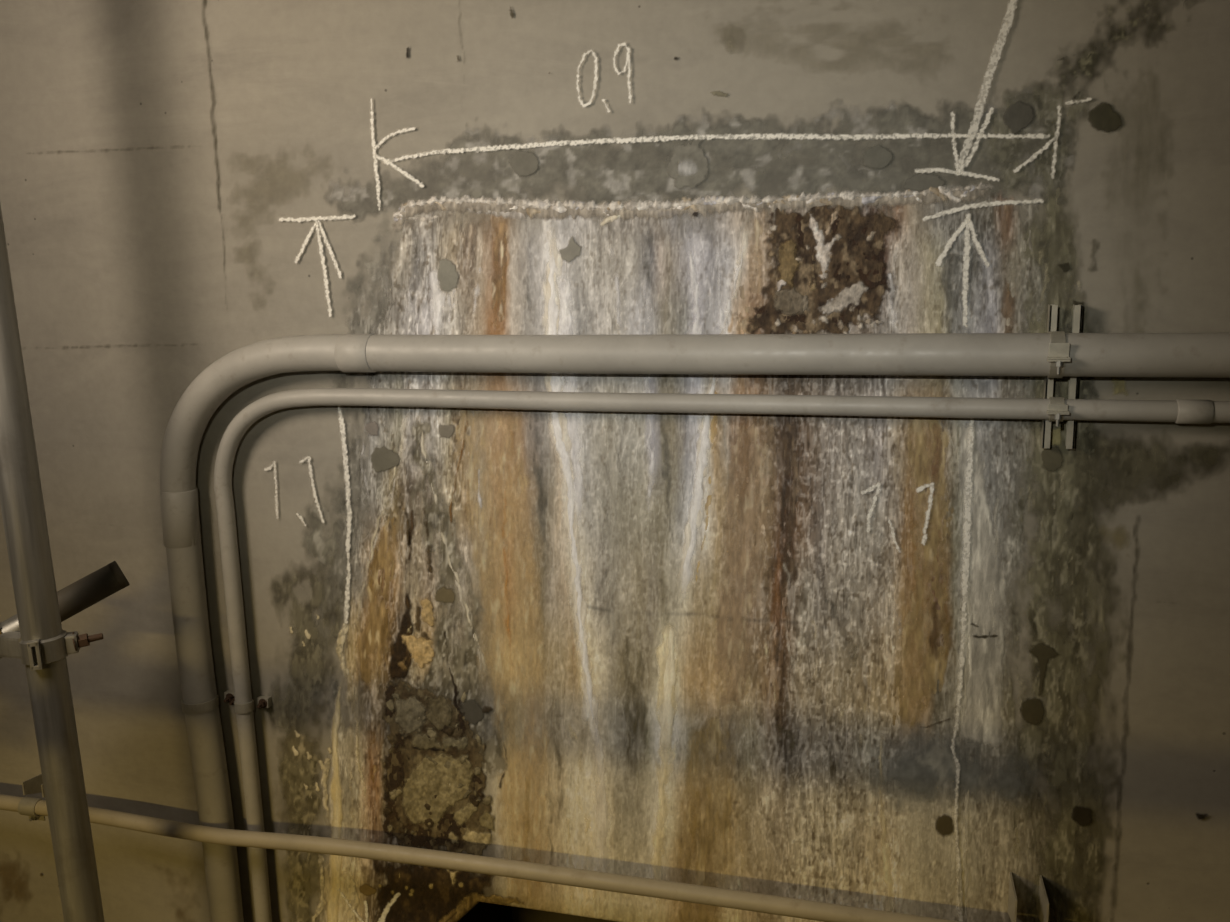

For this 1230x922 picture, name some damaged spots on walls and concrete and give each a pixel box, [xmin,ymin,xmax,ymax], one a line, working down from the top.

damp [330,0,1170,335]
corrosion [493,222,507,321]
spalling [740,205,896,334]
damp [366,371,1088,399]
corrosion [358,517,395,683]
spalling [383,595,494,856]
damp [270,406,1229,922]
corrosion [773,423,800,610]
corrosion [892,417,950,725]
spalling [373,860,524,922]